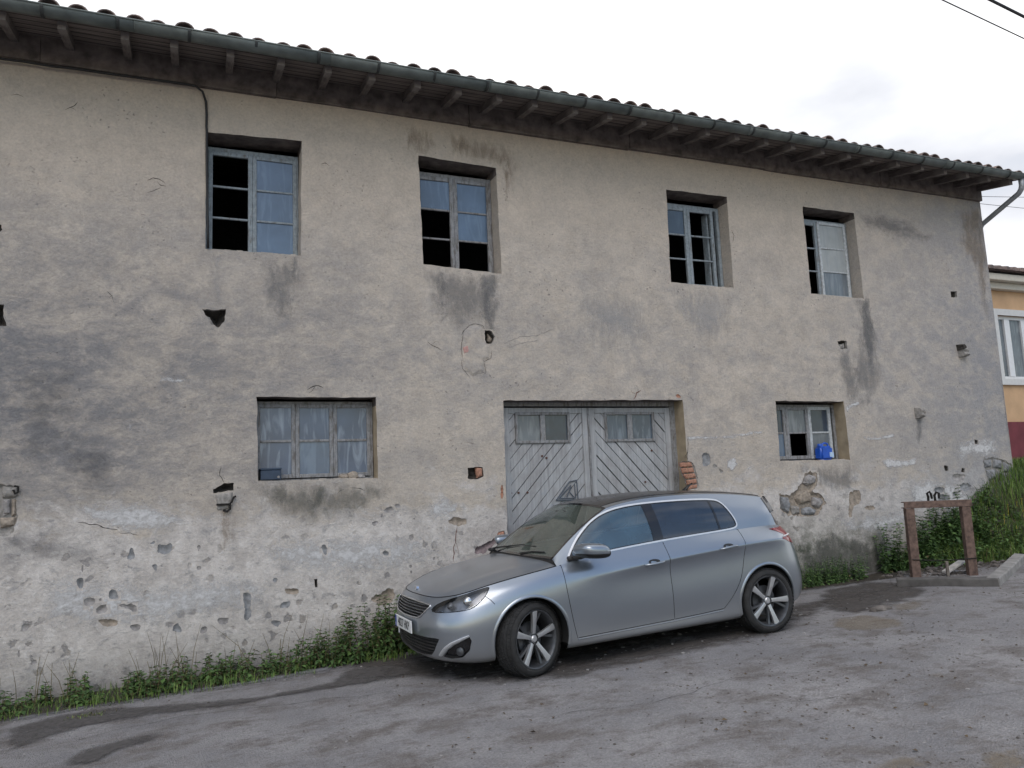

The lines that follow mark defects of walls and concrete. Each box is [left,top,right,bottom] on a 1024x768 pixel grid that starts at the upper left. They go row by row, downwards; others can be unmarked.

flaking render [678,453,737,490]
flaking render [911,440,1011,508]
spalling [448,517,467,526]
spalling [779,471,826,517]
flaking render [846,490,903,531]
spalling [475,531,505,554]
spalling [371,588,395,606]